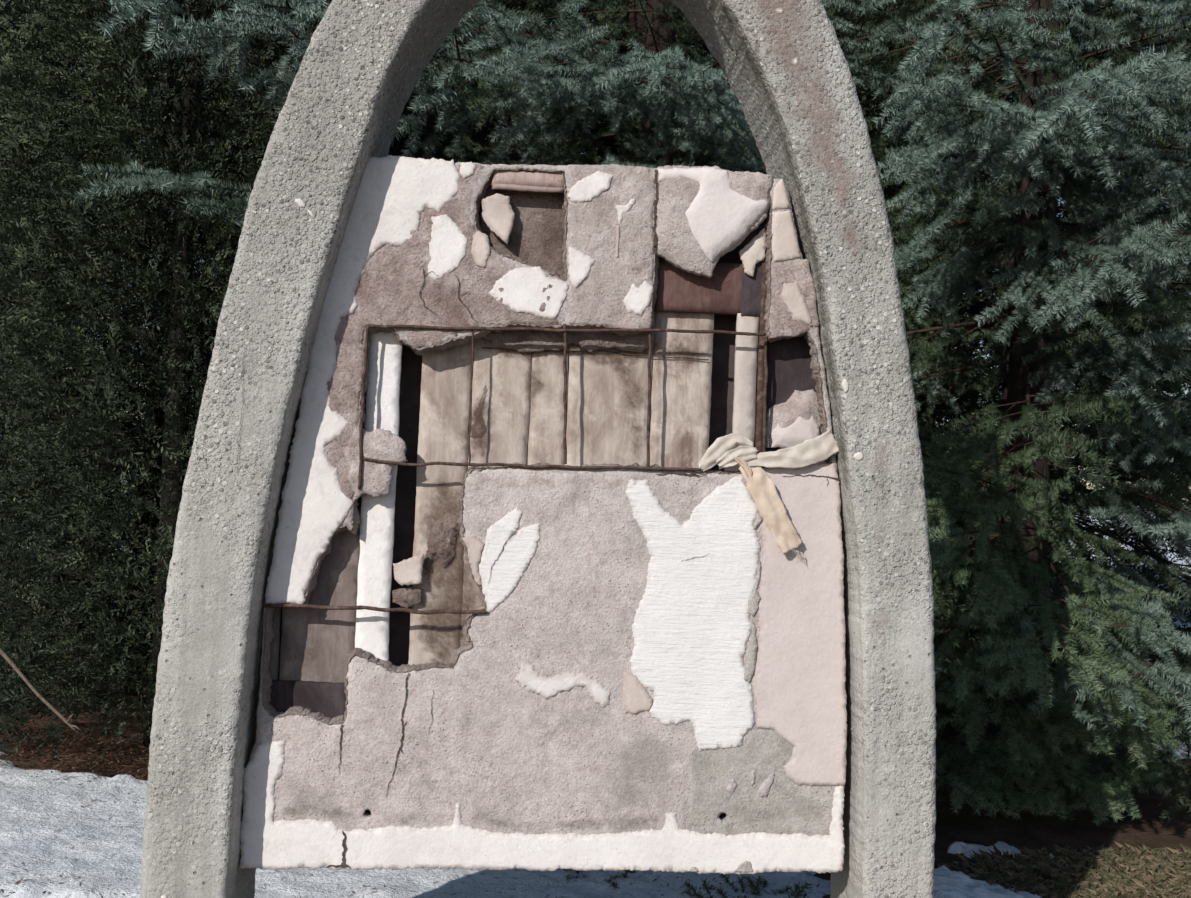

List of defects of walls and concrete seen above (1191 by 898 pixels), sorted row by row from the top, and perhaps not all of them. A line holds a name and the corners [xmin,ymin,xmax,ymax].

crack [419,269,477,322]
flaking render [293,162,659,604]
water stain [426,482,459,537]
water stain [422,533,470,662]
flaking render [258,462,833,836]
crack [386,673,434,795]